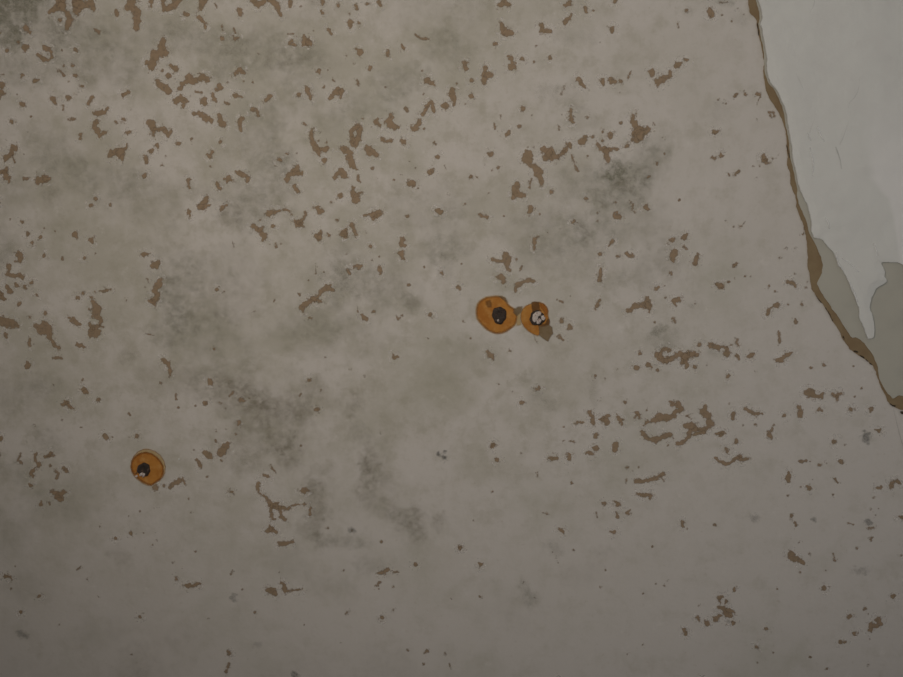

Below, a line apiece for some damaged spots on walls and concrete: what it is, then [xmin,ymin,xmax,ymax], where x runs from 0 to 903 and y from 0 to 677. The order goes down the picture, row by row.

corrosion [476,296,553,341]
peeling [775,331,797,365]
peeling [767,384,842,440]
corrosion [131,449,165,485]
peeling [783,542,810,573]
peeling [838,607,883,644]